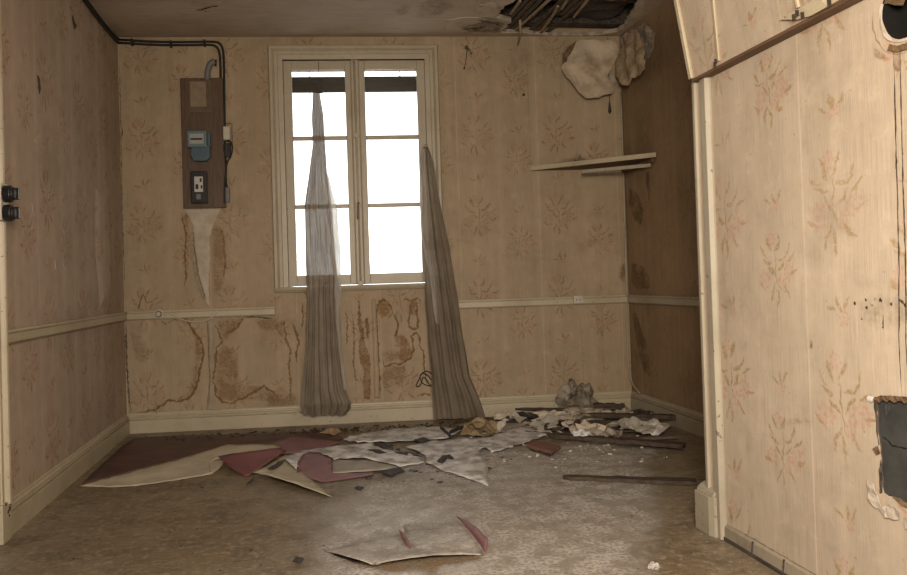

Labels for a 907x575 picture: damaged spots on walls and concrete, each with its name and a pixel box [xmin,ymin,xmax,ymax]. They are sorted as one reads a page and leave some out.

spalling [444,0,535,35]
spalling [579,0,655,61]
flaking render [186,209,220,306]
damp [139,304,304,413]
damp [376,298,427,391]
spalling [867,395,907,529]